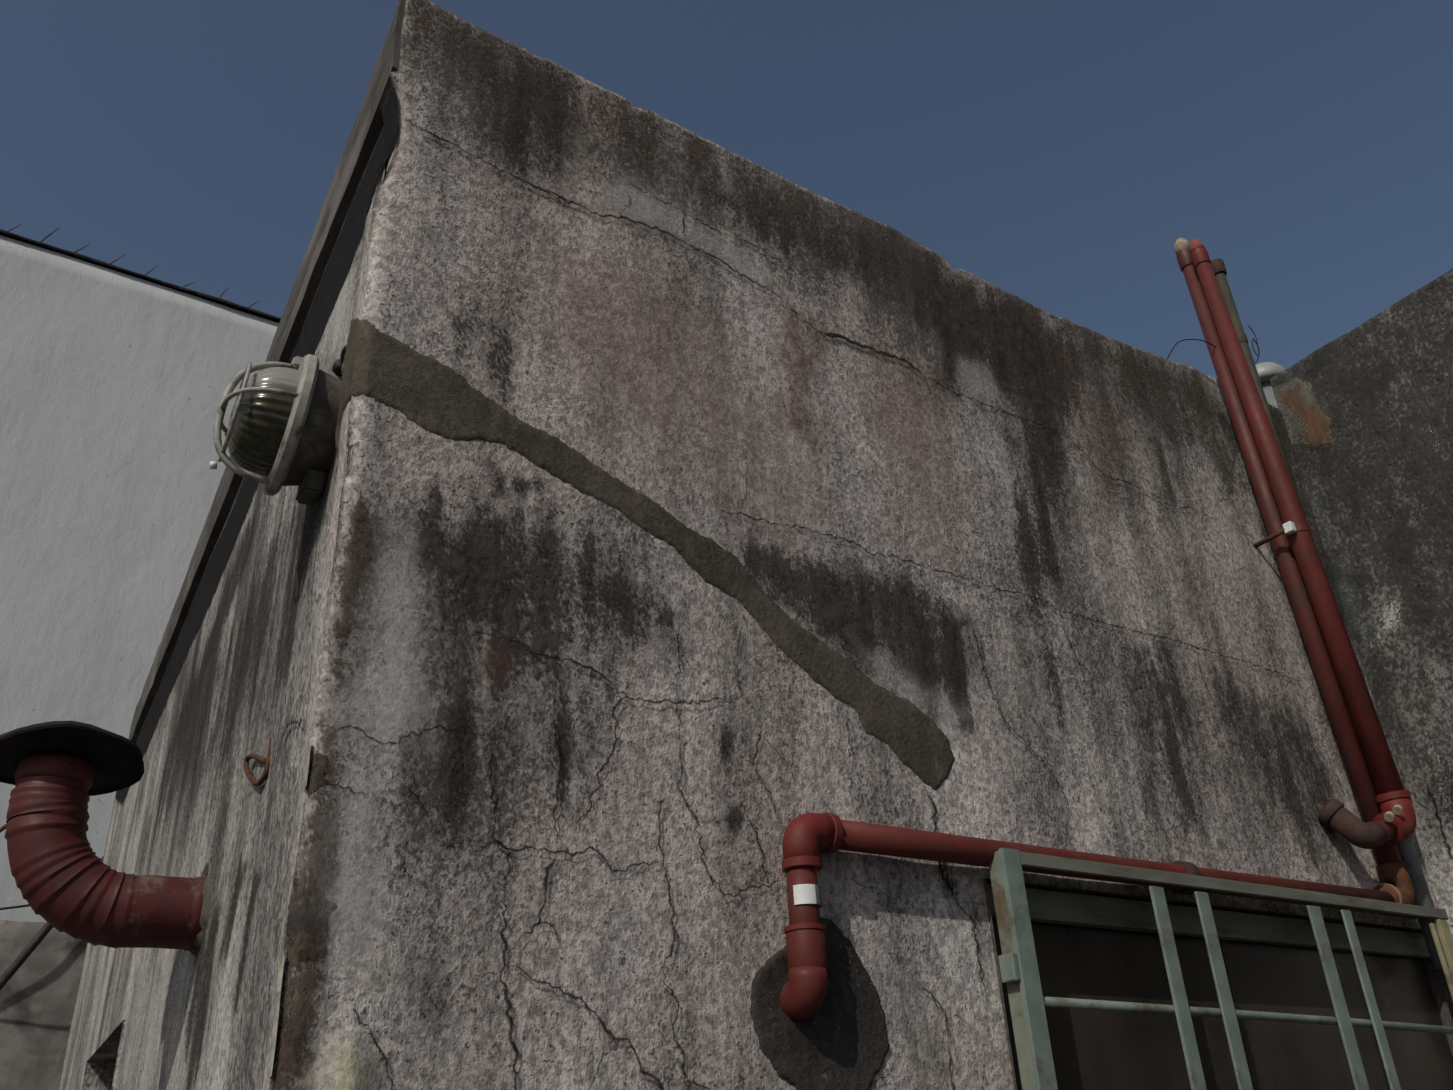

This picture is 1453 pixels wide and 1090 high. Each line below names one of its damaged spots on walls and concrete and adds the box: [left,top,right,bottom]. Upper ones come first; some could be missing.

leakage [290,81,398,364]
crack [366,124,1212,518]
leakage [395,0,1289,741]
leakage [115,787,129,805]
leakage [184,849,260,1090]
leakage [136,438,338,865]
crack [276,624,787,1090]
leakage [719,723,734,762]
leakage [725,805,744,834]
crack [871,969,968,1090]
crack [925,788,986,991]